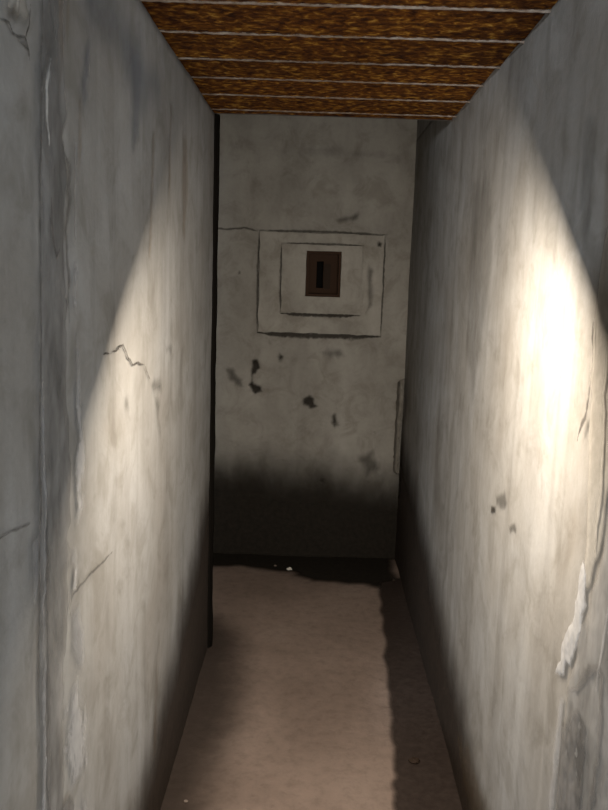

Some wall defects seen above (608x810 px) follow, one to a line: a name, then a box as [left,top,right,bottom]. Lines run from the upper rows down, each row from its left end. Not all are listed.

crack [104,345,150,379]